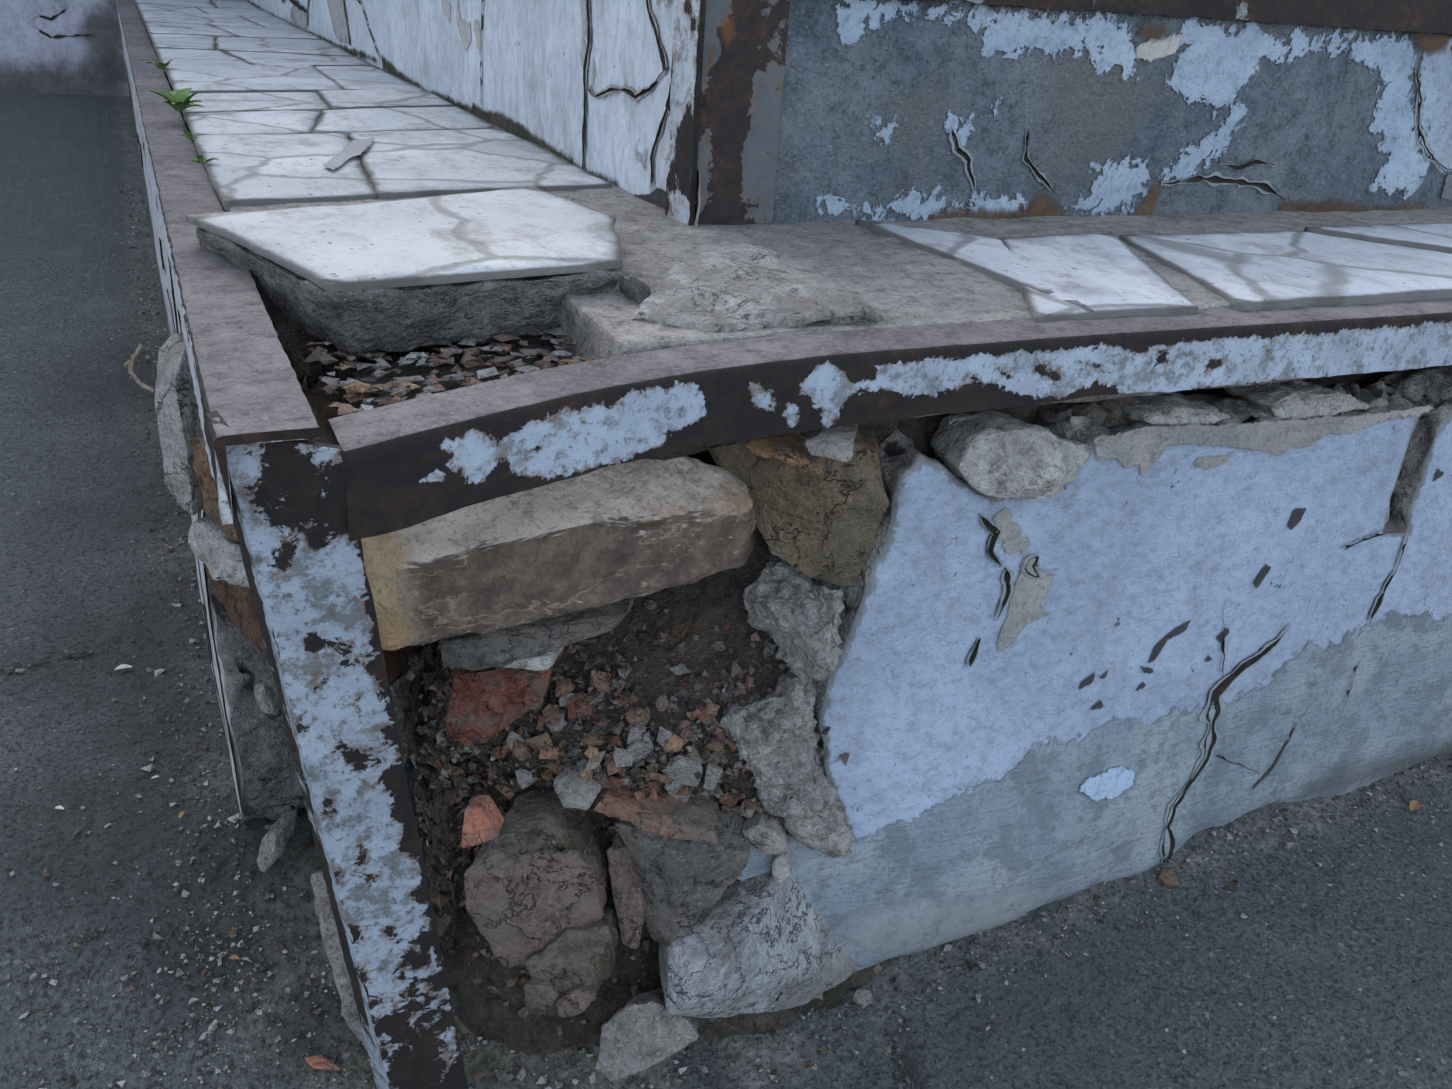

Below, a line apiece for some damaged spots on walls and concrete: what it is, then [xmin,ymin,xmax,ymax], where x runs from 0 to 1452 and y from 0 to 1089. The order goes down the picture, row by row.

rust [1412,33,1451,54]
crack [582,0,707,193]
peeling [830,0,1452,216]
peeling [814,185,1029,221]
crack [1161,159,1289,202]
crack [158,237,179,334]
peeling [1093,405,1433,476]
peeling [1288,508,1306,530]
peeling [1254,565,1271,588]
crack [1343,532,1408,627]
crack [1159,603,1305,863]
peeling [738,610,1452,970]